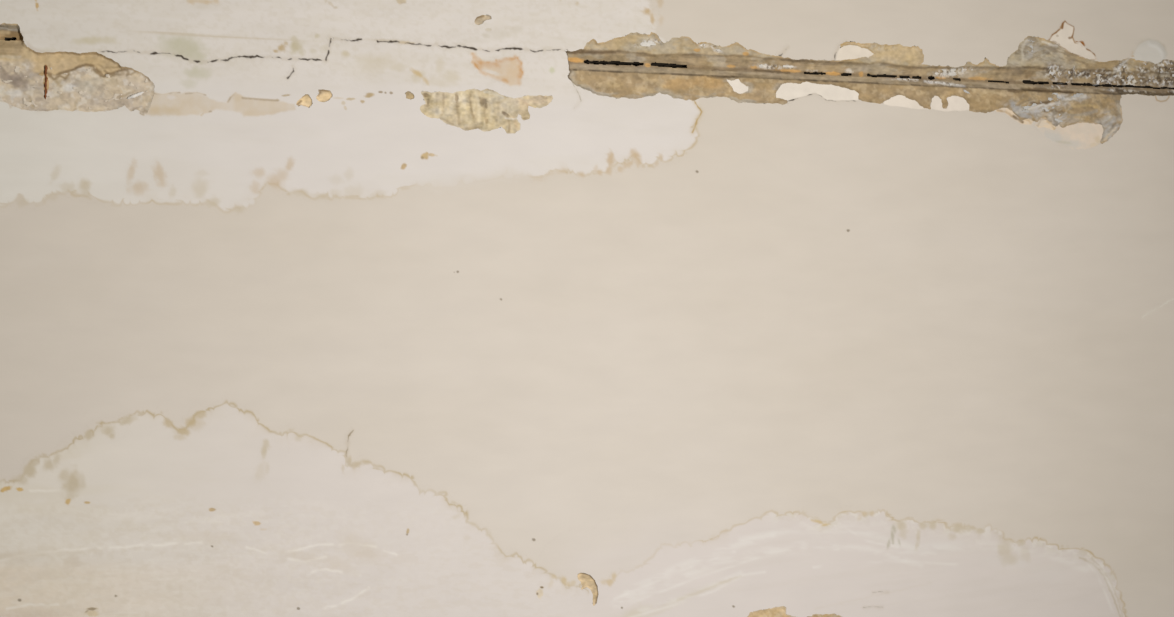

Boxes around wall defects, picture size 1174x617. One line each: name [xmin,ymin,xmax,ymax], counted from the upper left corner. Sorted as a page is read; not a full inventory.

flaking render [474,15,491,25]
flaking render [0,23,553,134]
crack [97,35,584,112]
flaking render [566,19,1174,150]
flaking render [400,151,438,171]
flaking render [577,573,598,606]
flaking render [747,606,841,617]